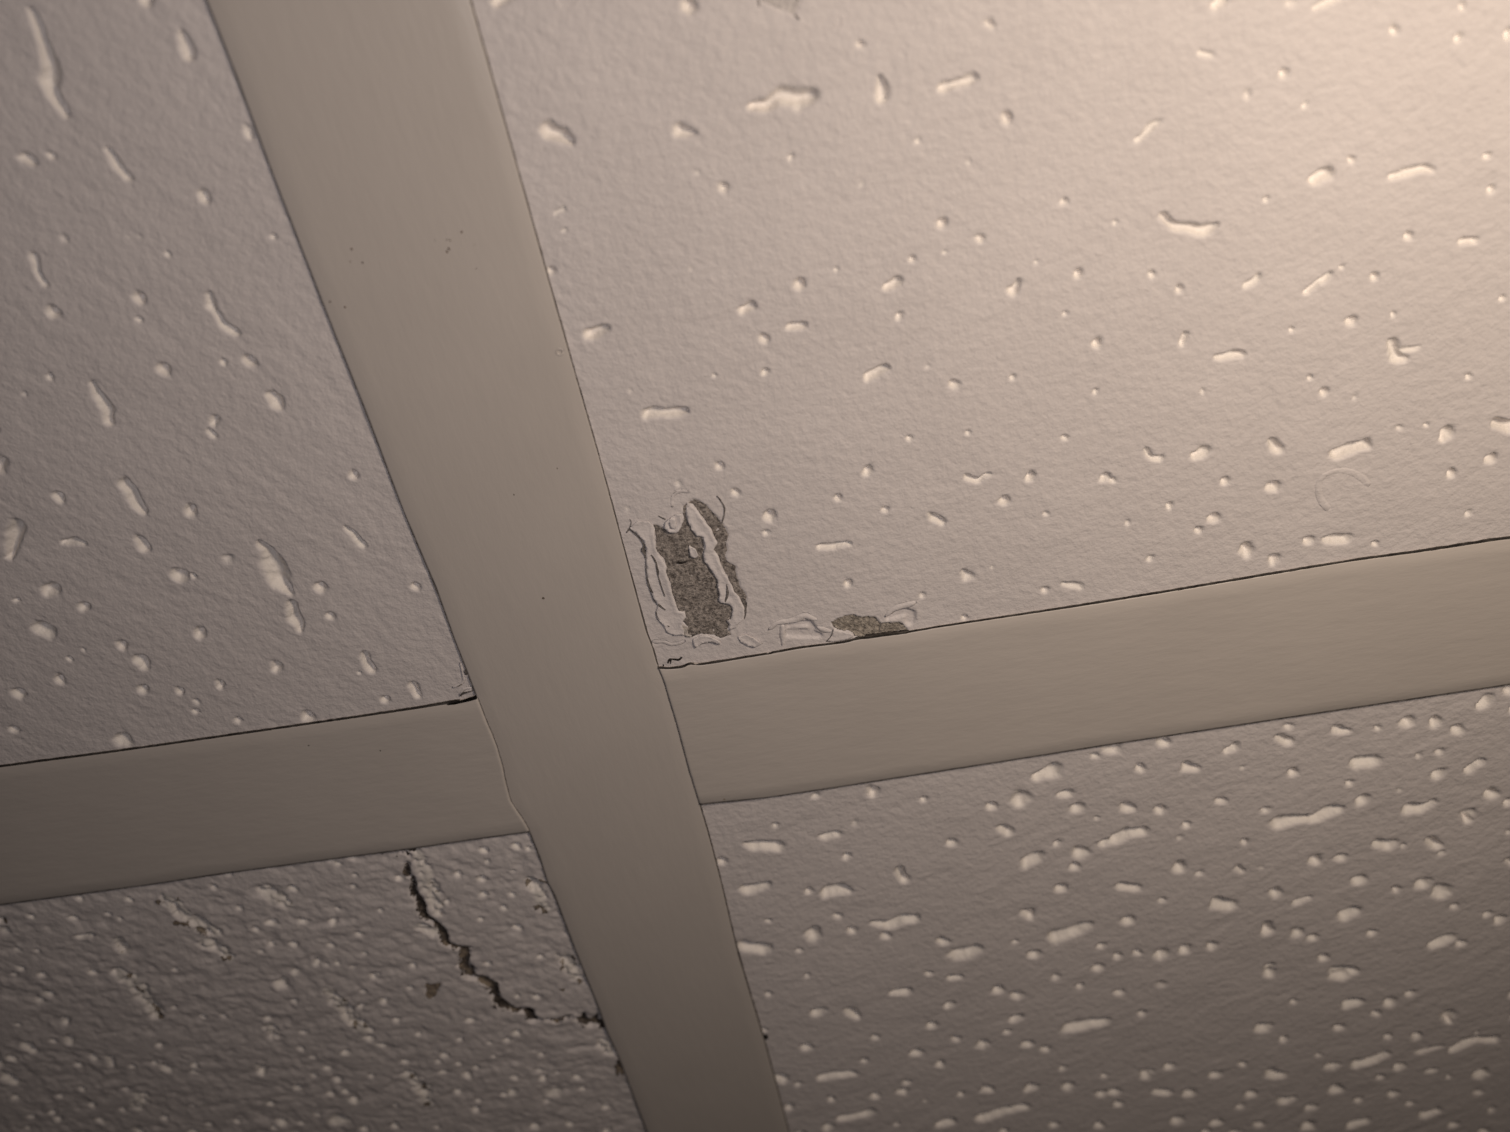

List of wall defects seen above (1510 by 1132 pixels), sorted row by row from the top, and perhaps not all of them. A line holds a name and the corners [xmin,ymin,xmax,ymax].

crack [0,0,647,1132]
peeling [626,488,762,666]
spalling [826,614,909,642]